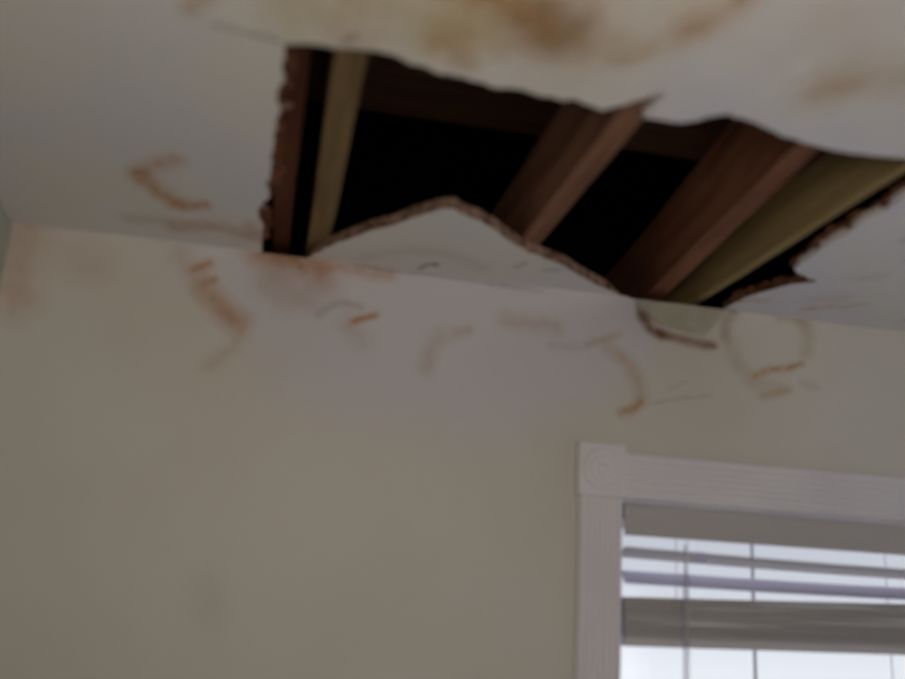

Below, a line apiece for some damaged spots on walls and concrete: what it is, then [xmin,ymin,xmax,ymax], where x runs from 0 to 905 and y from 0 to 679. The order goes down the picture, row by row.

spalling [260,181,277,254]
spalling [289,101,325,257]
spalling [331,109,541,236]
spalling [539,149,700,278]
spalling [641,188,892,347]